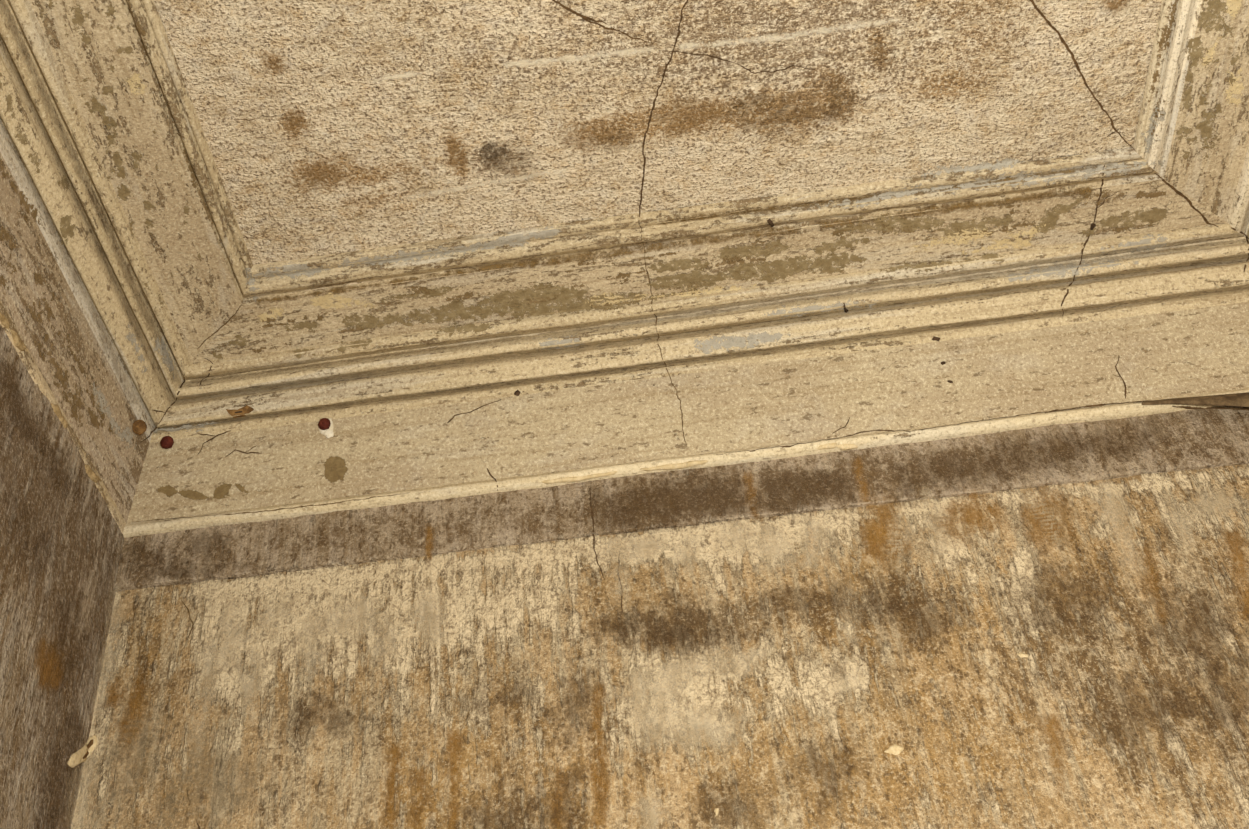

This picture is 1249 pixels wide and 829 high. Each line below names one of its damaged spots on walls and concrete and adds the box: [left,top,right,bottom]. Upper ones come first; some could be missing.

peeling [0,225,17,295]
peeling [0,73,41,173]
peeling [0,159,45,242]
peeling [39,0,223,248]
crack [552,0,815,447]
peeling [211,0,1245,359]
crack [1029,0,1135,316]
crack [1154,173,1249,272]
peeling [26,272,137,450]
spalling [226,405,254,418]